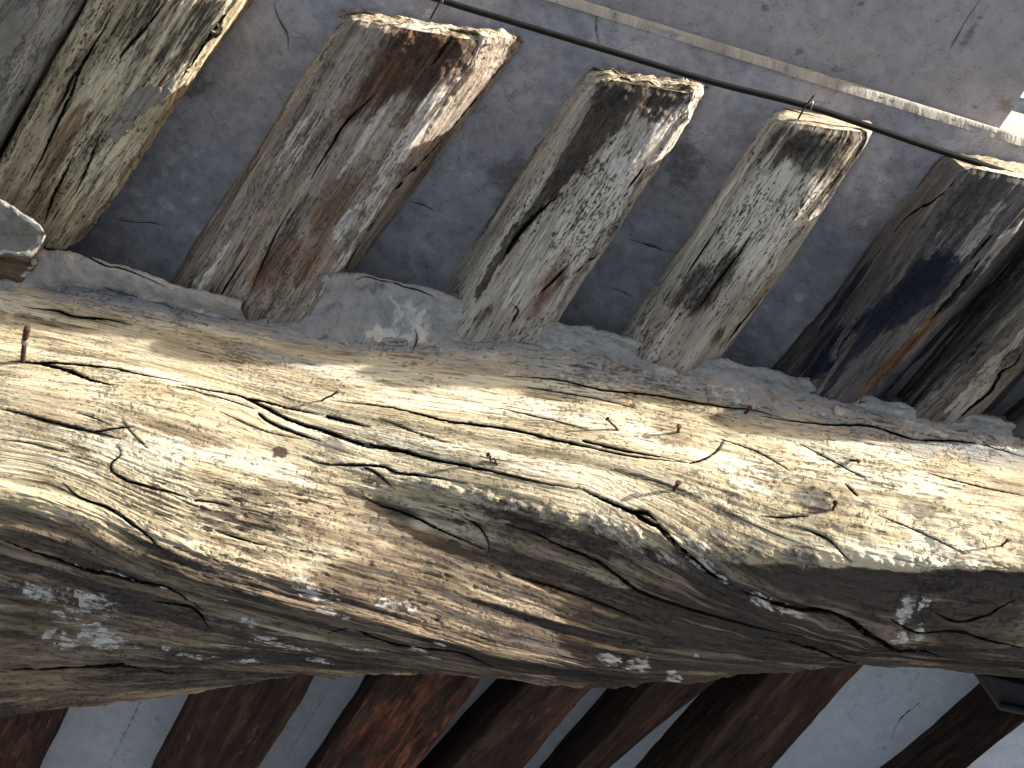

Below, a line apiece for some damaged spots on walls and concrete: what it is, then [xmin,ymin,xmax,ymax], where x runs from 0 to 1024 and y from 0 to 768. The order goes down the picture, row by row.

crack [0,352,1024,666]